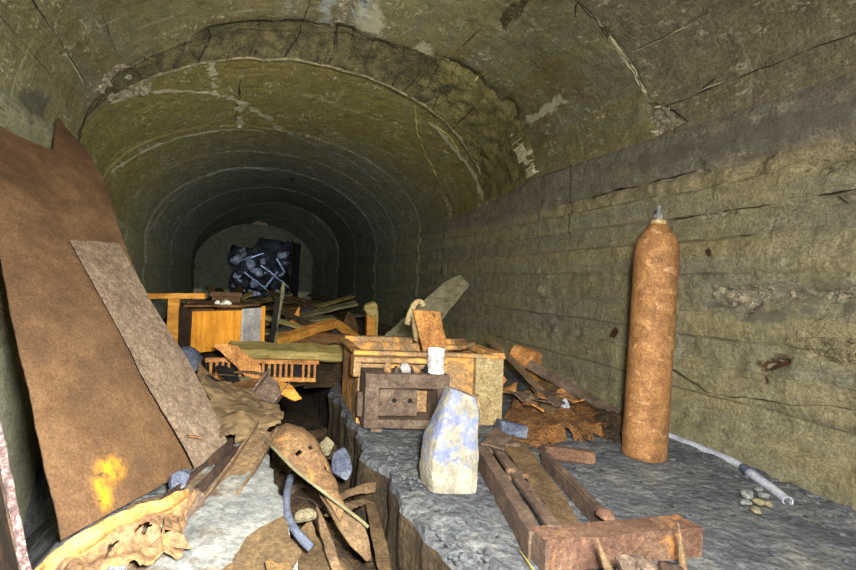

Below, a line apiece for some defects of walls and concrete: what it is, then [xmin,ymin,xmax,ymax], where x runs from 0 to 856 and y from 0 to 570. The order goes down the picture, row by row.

water stain [319,0,337,24]
water stain [348,0,384,33]
crack [32,0,88,88]
crack [575,0,725,90]
crack [665,32,856,123]
spalling [77,0,539,200]
spalling [640,87,685,136]
spalling [703,284,856,316]
crack [673,369,852,410]
corrosion [758,357,791,384]
spalling [798,339,856,370]